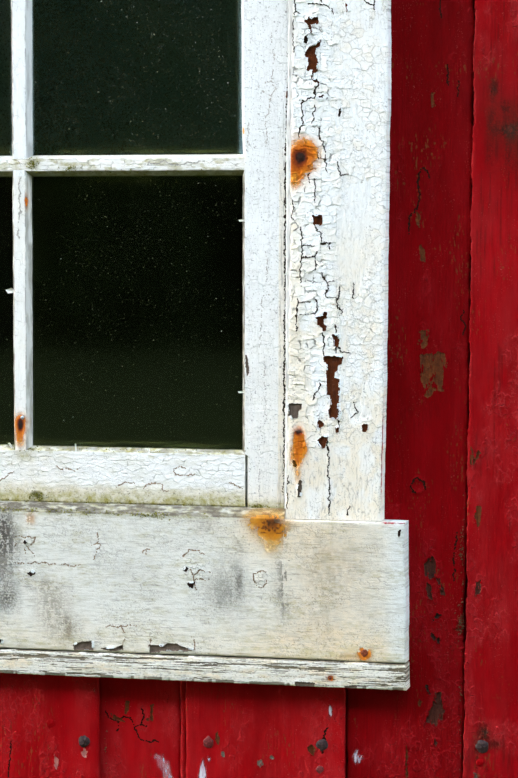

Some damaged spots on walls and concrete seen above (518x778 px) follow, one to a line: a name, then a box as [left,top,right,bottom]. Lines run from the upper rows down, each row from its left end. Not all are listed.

peeling [304,14,321,86]
rust [291,137,319,185]
peeling [310,214,322,227]
crack [229,0,355,509]
peeling [312,312,343,449]
rust [15,414,26,443]
crack [116,466,195,492]
peeling [287,403,302,419]
rust [292,428,307,466]
crack [326,402,359,516]
leakage [0,510,15,567]
rust [248,515,287,545]